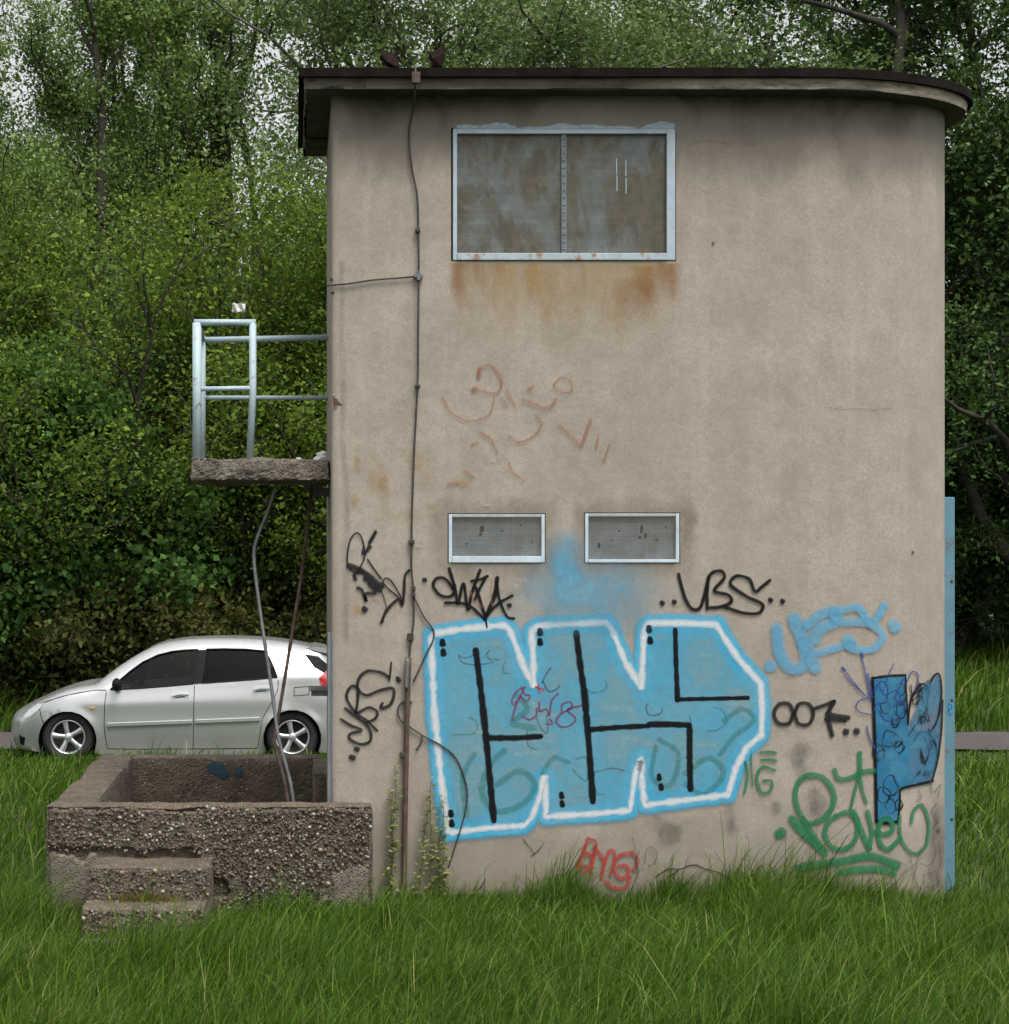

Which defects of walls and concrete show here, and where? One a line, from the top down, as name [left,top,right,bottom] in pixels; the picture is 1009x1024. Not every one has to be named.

spalling [47,805,372,938]